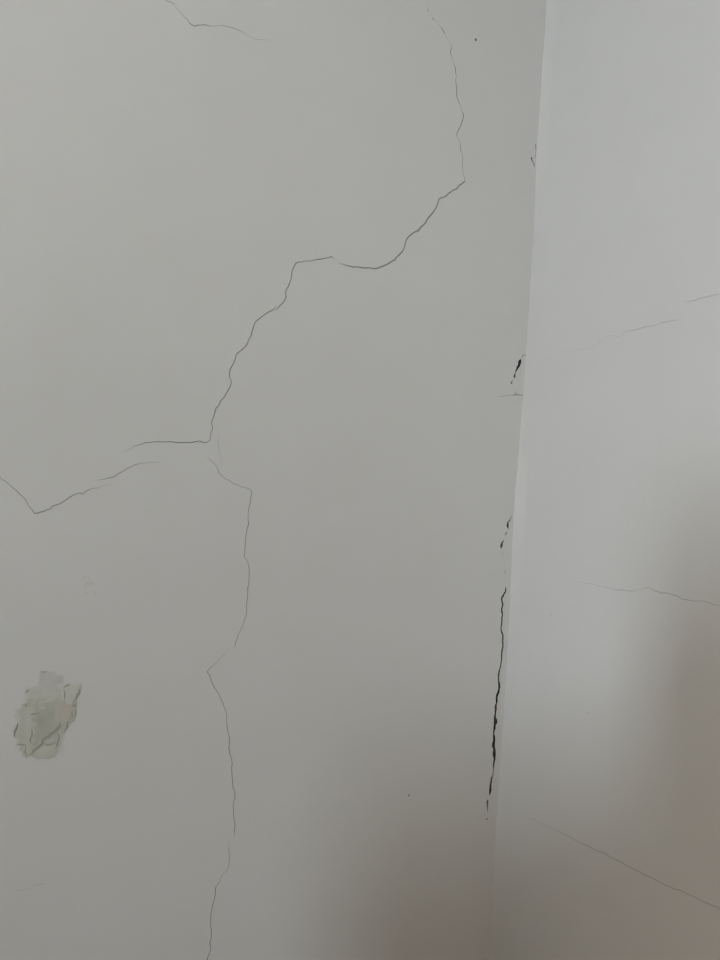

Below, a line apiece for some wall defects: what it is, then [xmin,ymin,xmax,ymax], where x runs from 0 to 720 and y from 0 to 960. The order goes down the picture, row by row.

crack [0,0,465,960]
crack [497,354,526,397]
crack [486,515,512,820]